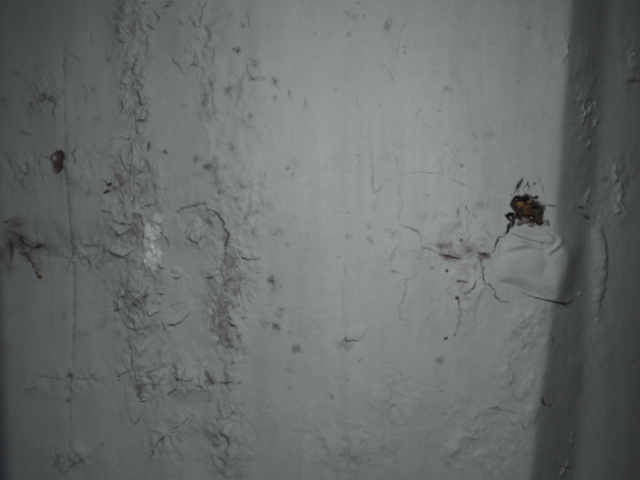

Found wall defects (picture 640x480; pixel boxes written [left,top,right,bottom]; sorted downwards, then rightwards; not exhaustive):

peeling [101,174,145,257]
crack [471,232,507,302]